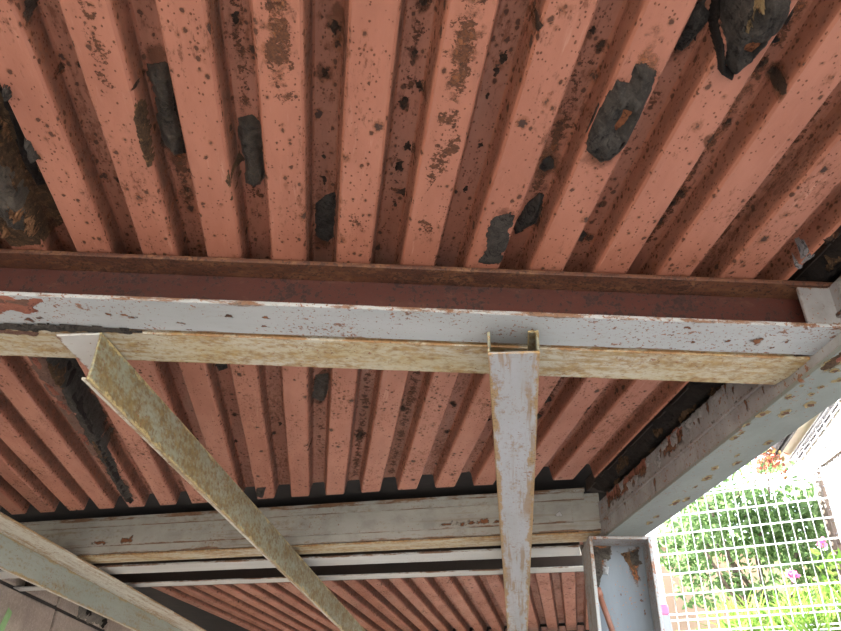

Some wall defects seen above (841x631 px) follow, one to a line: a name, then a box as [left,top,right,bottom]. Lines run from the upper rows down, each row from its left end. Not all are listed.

corrosion [230,0,252,105]
corrosion [261,0,294,105]
corrosion [421,0,488,201]
corrosion [225,114,265,200]
corrosion [391,141,415,207]
corrosion [791,233,841,282]
peeling [0,295,44,337]
peeling [28,356,98,456]
peeling [606,383,744,508]
corrosion [592,382,791,505]
corrosion [799,352,841,408]
corrosion [593,546,643,588]